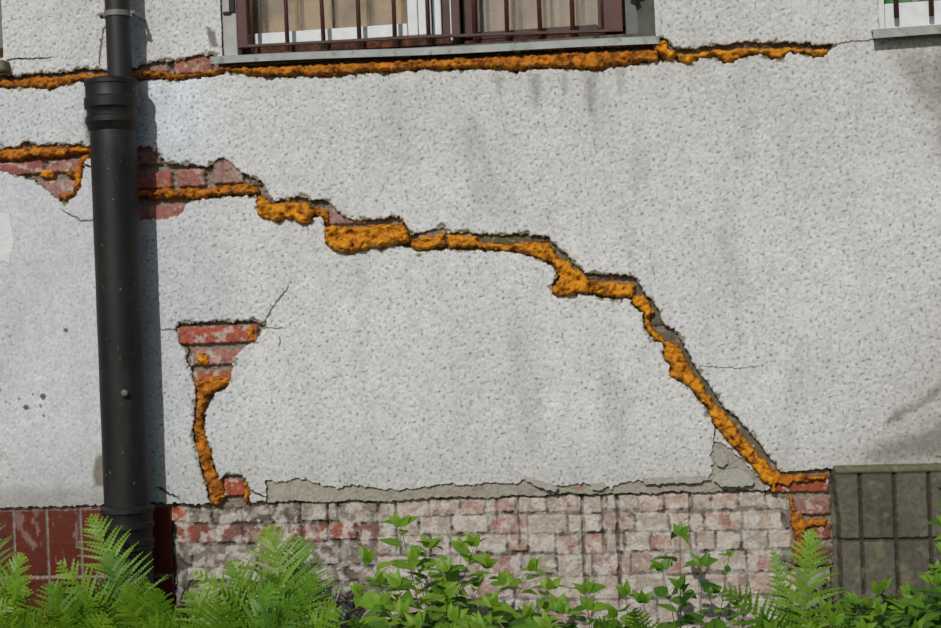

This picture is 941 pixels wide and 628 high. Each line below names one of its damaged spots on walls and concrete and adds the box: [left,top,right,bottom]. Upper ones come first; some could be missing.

flaking render [0,142,93,221]
crack [137,147,778,492]
flaking render [159,283,833,565]
crack [132,35,876,81]